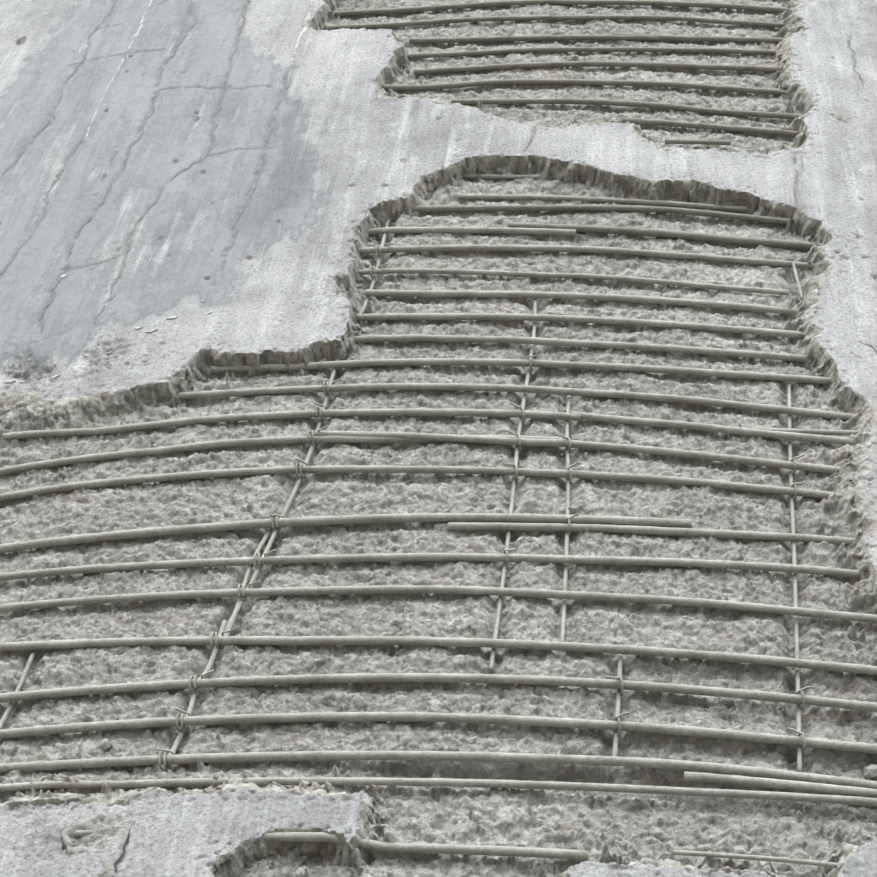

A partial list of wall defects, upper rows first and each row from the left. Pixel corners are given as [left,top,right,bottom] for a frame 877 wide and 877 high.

crack [0,0,251,339]
crack [213,62,294,286]
spalling [303,0,814,155]
spalling [0,155,877,703]
crack [113,825,132,877]
spalling [0,682,877,877]